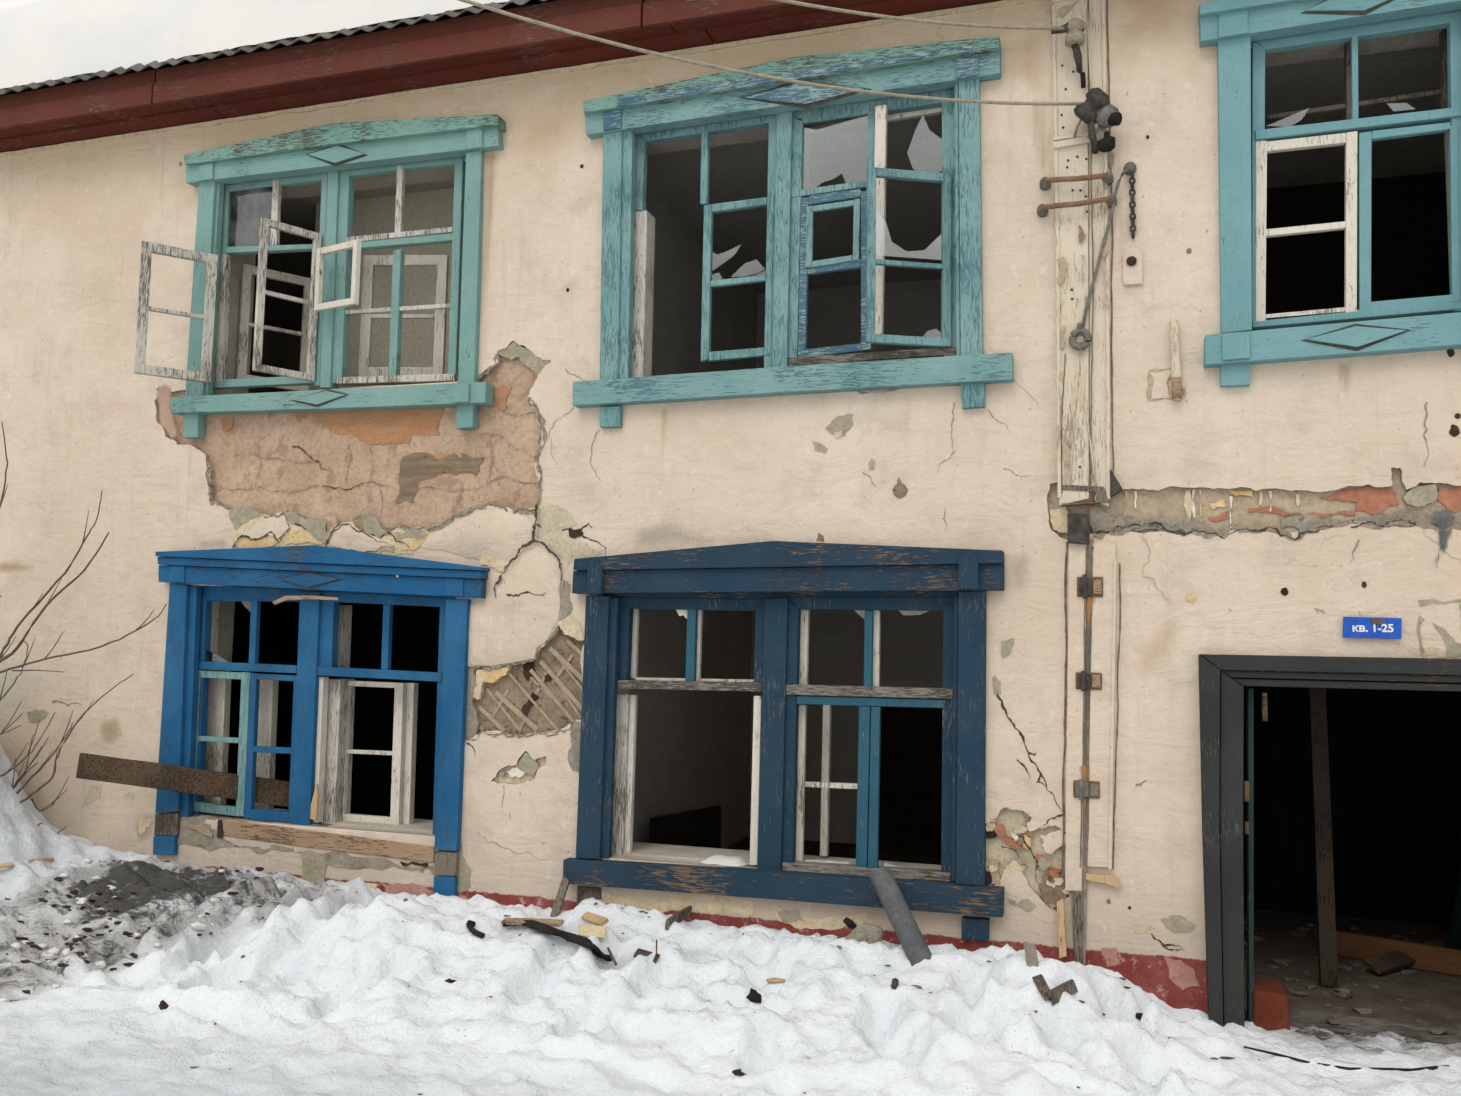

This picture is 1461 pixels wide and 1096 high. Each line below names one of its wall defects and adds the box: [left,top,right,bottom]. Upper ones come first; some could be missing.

flaking render [1146,368,1172,401]
flaking render [812,414,853,454]
flaking render [159,342,603,784]
crack [493,504,606,598]
flaking render [1047,469,1461,541]
flaking render [1417,598,1461,658]
crack [996,694,1063,825]
flaking render [985,808,1071,912]